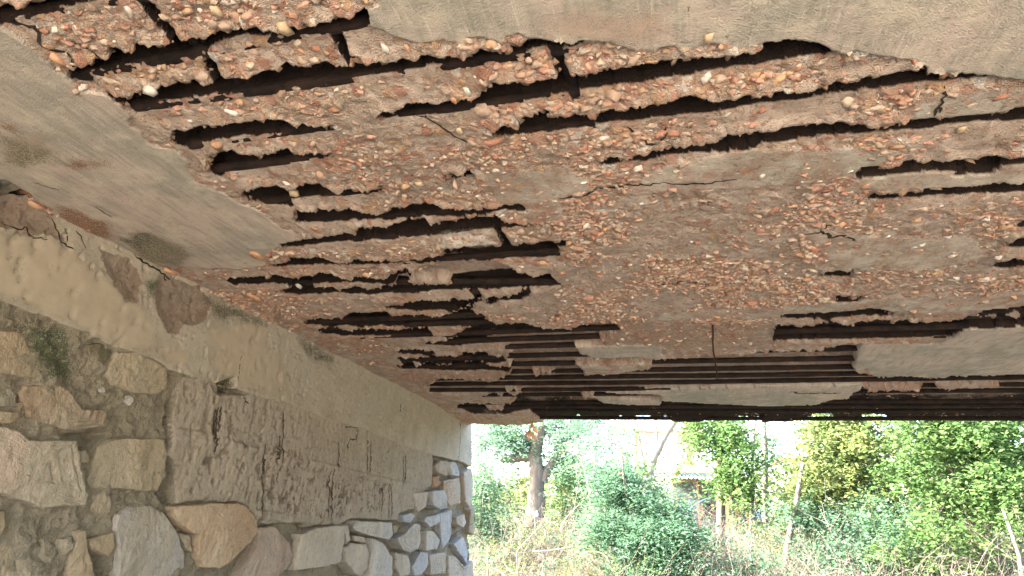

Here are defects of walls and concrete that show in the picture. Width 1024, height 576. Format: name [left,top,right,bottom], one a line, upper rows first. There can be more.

crack [416,115,467,143]
crack [560,179,736,199]
spalling [0,0,1024,426]
crack [3,219,86,250]
crack [804,224,856,241]